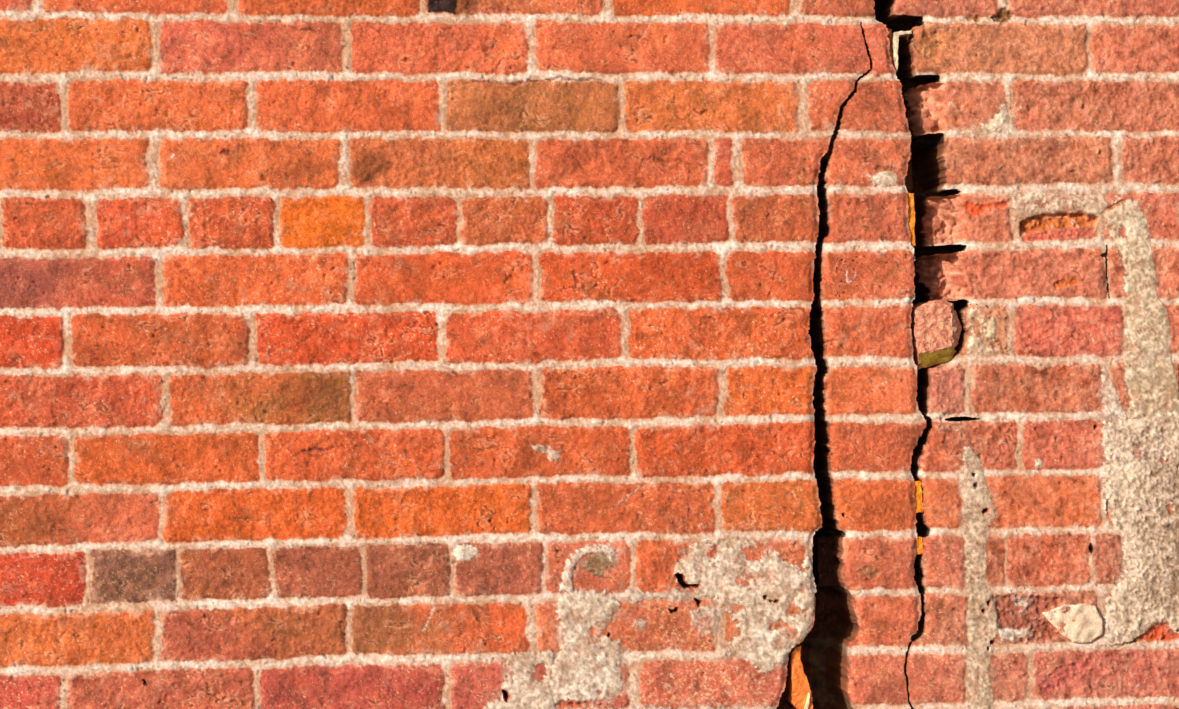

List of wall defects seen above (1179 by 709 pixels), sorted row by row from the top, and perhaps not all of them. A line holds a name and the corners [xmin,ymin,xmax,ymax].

spalling [1019,199,1126,243]
crack [776,0,980,709]
peeling [1093,365,1127,430]
peeling [620,572,719,635]
spalling [1140,622,1179,643]
spalling [555,699,610,709]